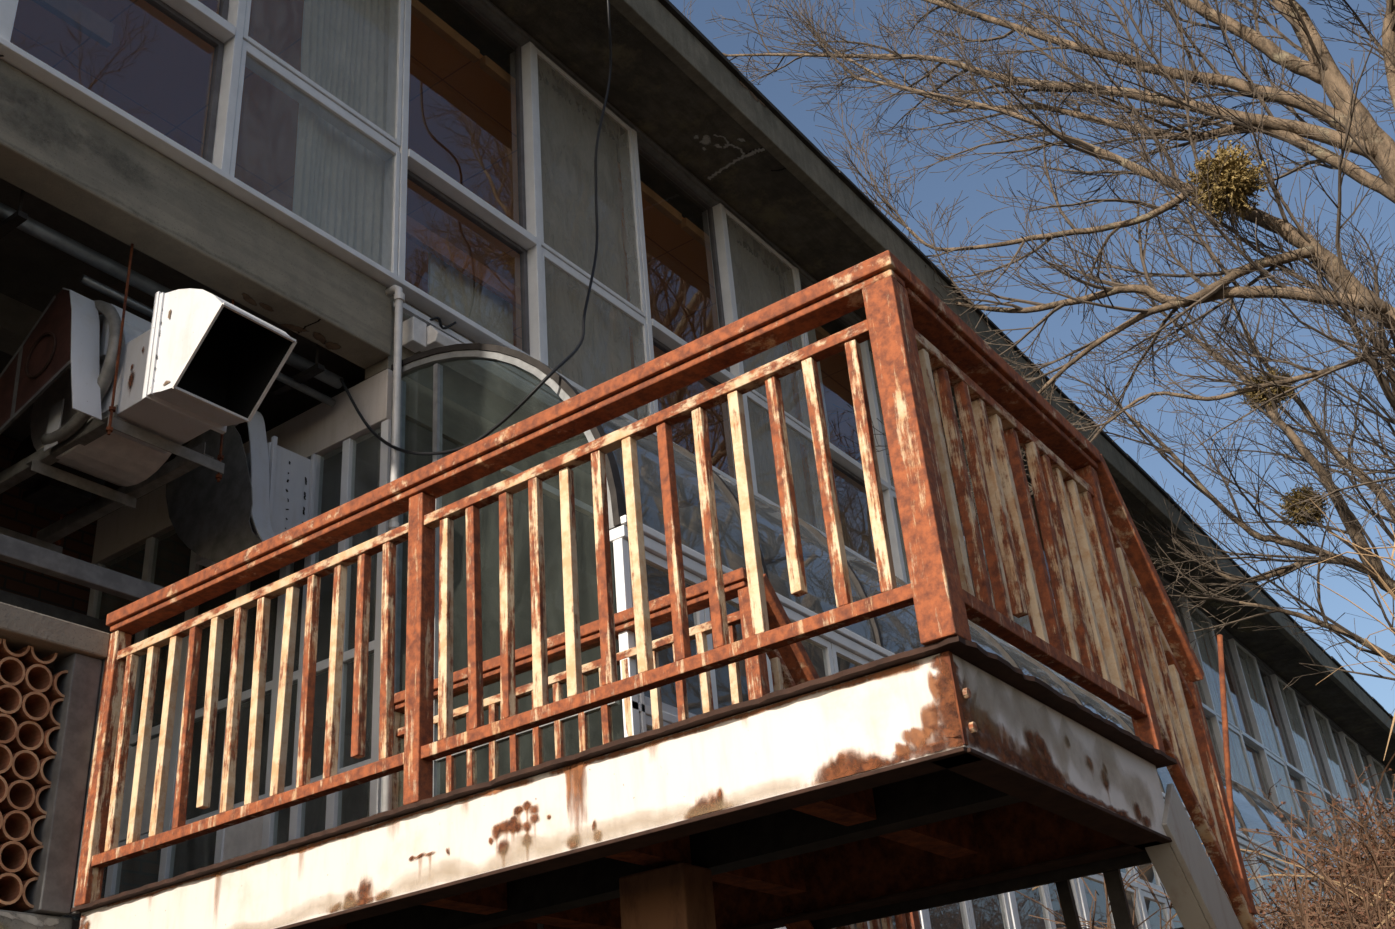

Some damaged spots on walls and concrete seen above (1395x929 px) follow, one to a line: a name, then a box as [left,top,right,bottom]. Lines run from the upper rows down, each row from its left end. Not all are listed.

corrosion [107,778,550,907]
corrosion [551,654,1151,849]